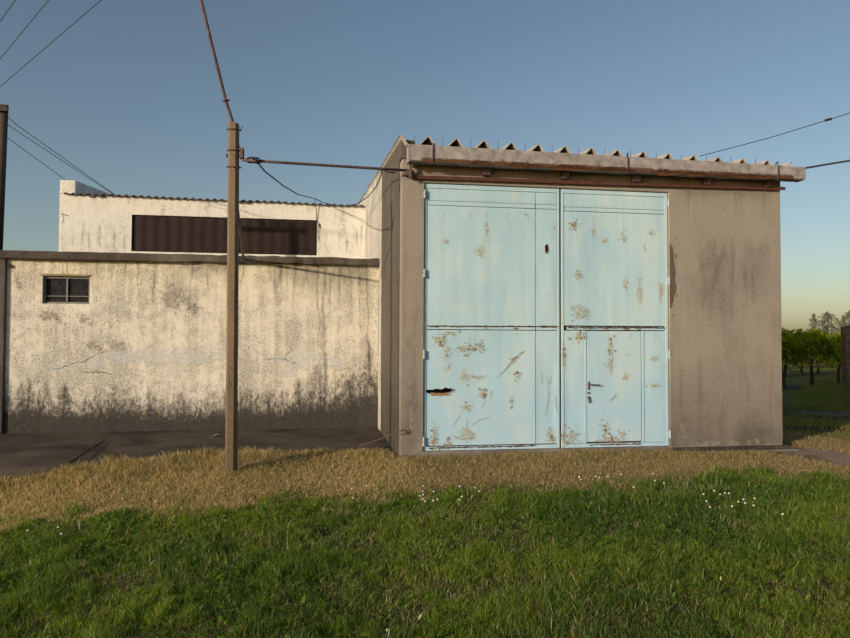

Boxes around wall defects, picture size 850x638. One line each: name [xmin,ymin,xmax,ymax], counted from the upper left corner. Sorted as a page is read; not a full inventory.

rust [428,304,665,375]
water stain [4,386,226,433]
water stain [238,366,378,430]
peeling [427,388,454,396]
rust [428,419,536,451]
rust [589,419,640,446]